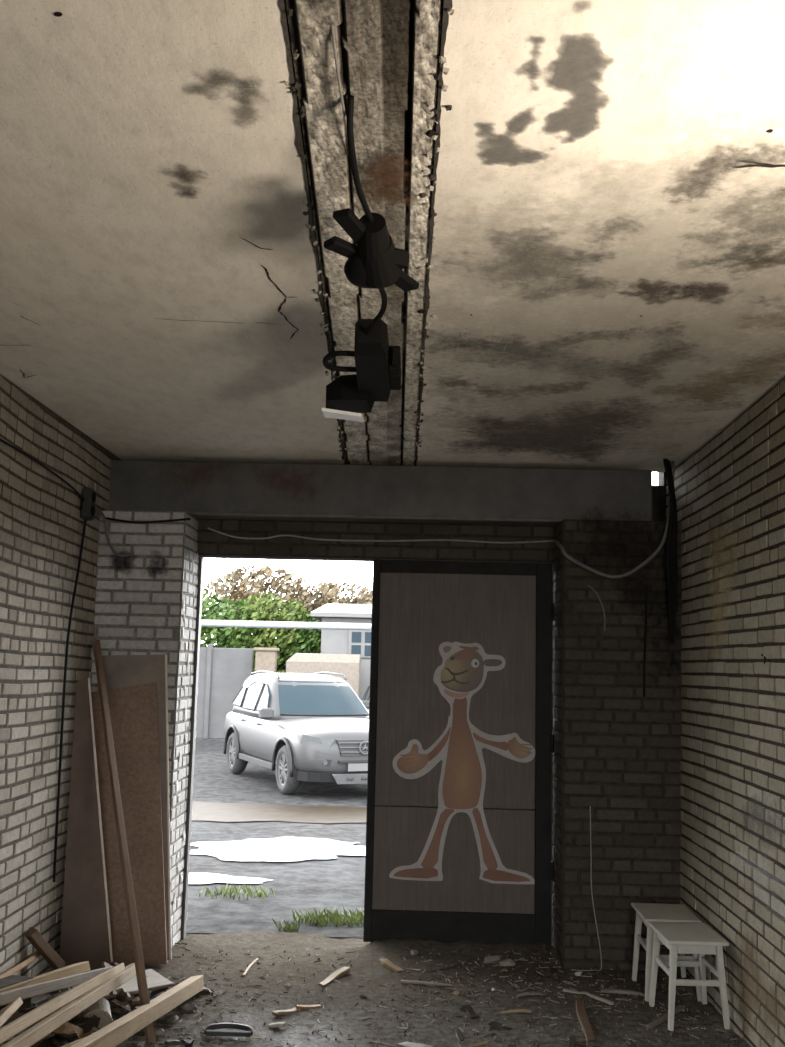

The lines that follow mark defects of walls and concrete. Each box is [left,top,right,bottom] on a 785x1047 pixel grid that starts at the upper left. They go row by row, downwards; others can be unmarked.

damp [188,74,259,123]
damp [174,166,196,197]
crack [732,161,785,169]
crack [153,237,299,339]
damp [620,280,728,303]
damp [456,402,639,460]